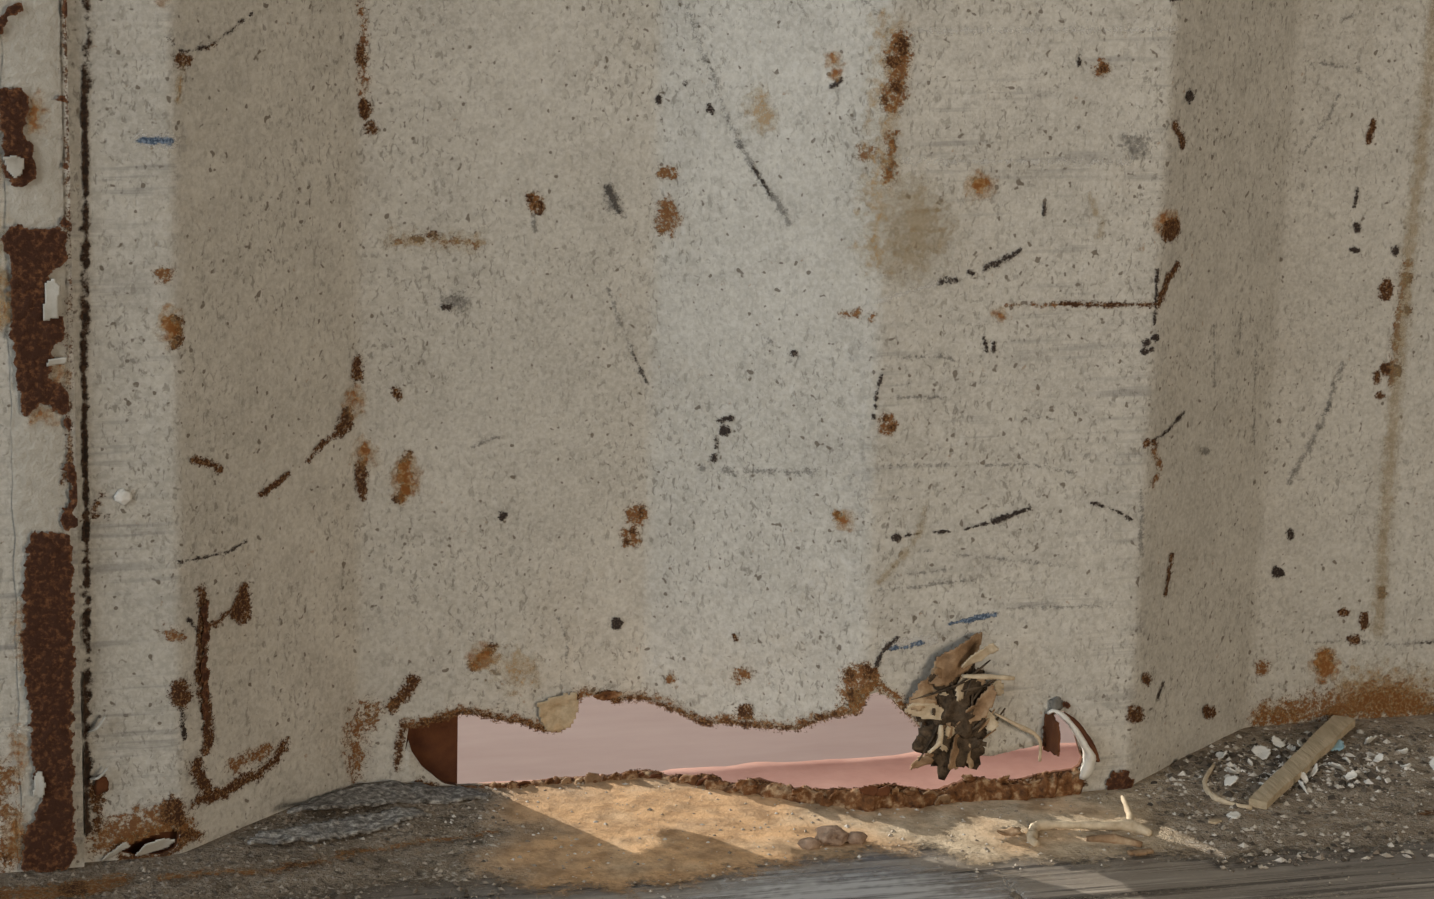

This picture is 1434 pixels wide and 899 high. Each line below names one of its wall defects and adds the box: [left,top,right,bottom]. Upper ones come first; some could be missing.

rust [854,12,915,265]
rust [345,354,365,419]
rust [354,441,373,502]
rust [0,582,291,899]